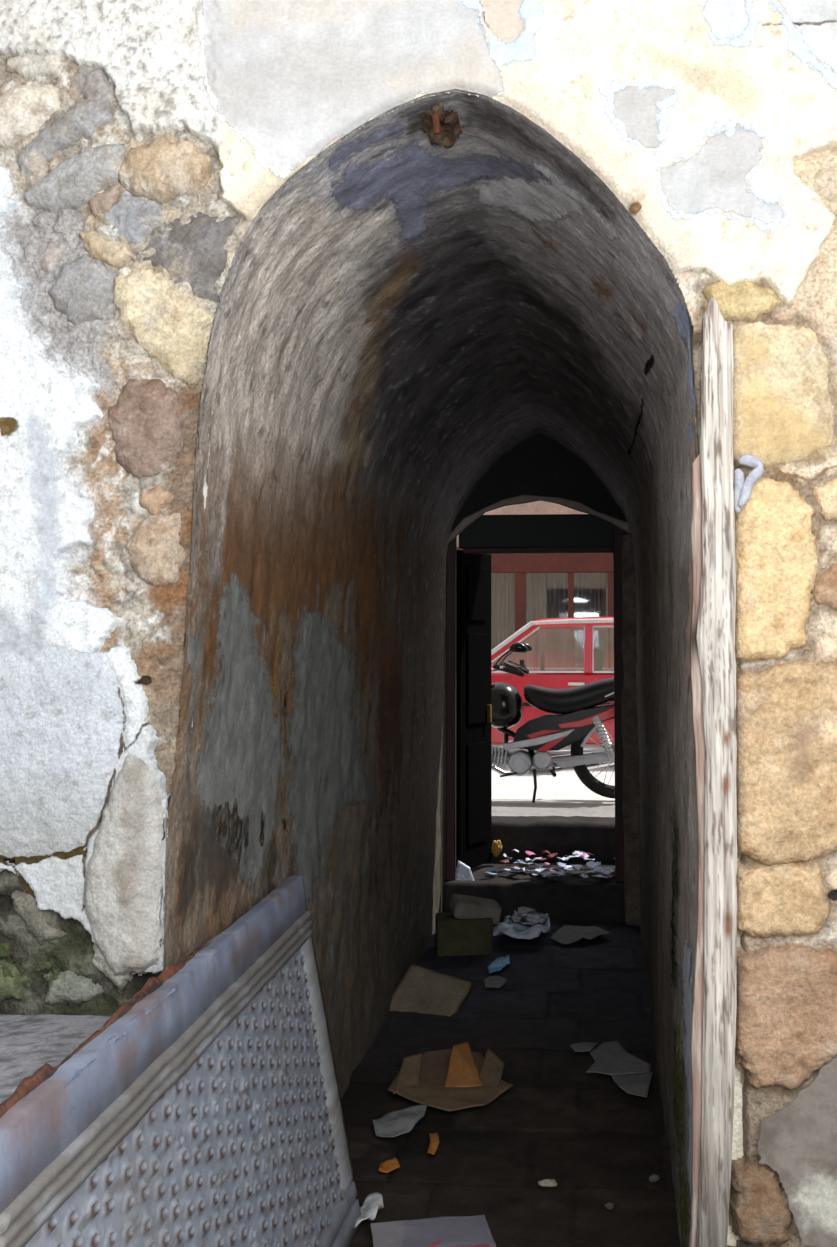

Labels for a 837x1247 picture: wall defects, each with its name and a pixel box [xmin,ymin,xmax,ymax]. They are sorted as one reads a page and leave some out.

peeling [195,0,618,245]
peeling [599,77,791,234]
peeling [768,0,837,89]
flaking render [0,52,253,808]
crack [0,688,149,911]
peeling [196,572,375,901]
flaking render [671,147,837,1247]
flaking render [0,869,164,1016]